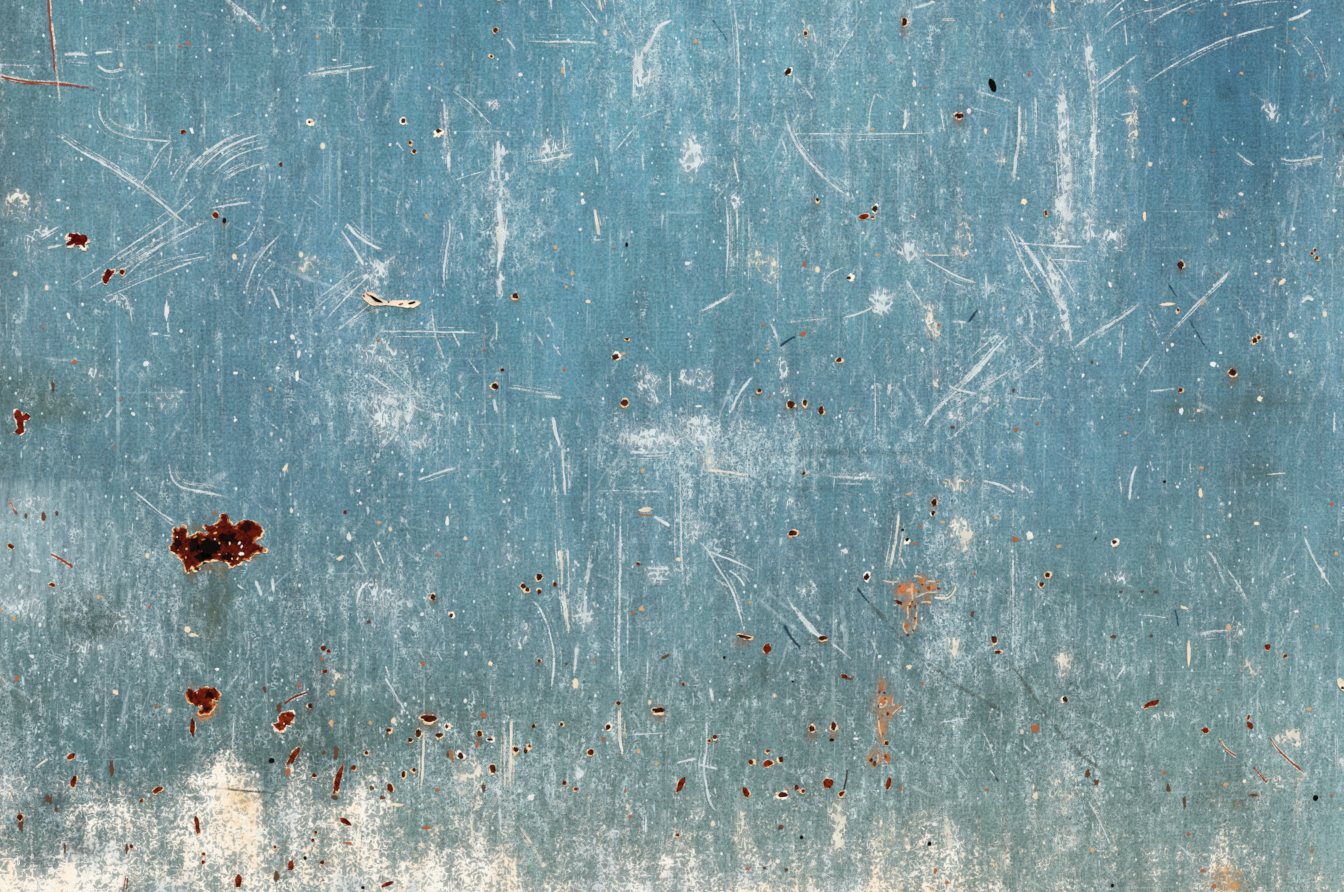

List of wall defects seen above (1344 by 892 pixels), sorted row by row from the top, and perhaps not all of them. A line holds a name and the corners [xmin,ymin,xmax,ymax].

rust [64,232,90,251]
rust [101,269,116,285]
peeling [362,291,421,308]
rust [13,409,31,436]
rust [168,511,268,574]
rust [883,575,940,636]
rust [185,686,222,719]
rust [271,702,295,734]
spalling [408,714,453,743]
spalling [808,722,838,735]
rust [868,683,902,766]
peeling [0,736,1344,892]